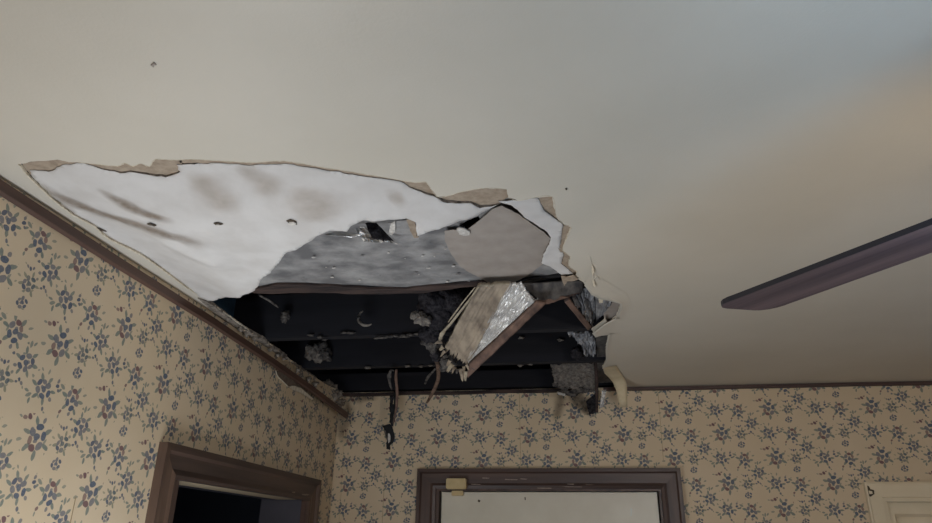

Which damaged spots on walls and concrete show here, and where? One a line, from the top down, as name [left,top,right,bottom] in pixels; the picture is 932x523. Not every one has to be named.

peeling [584,273,632,407]